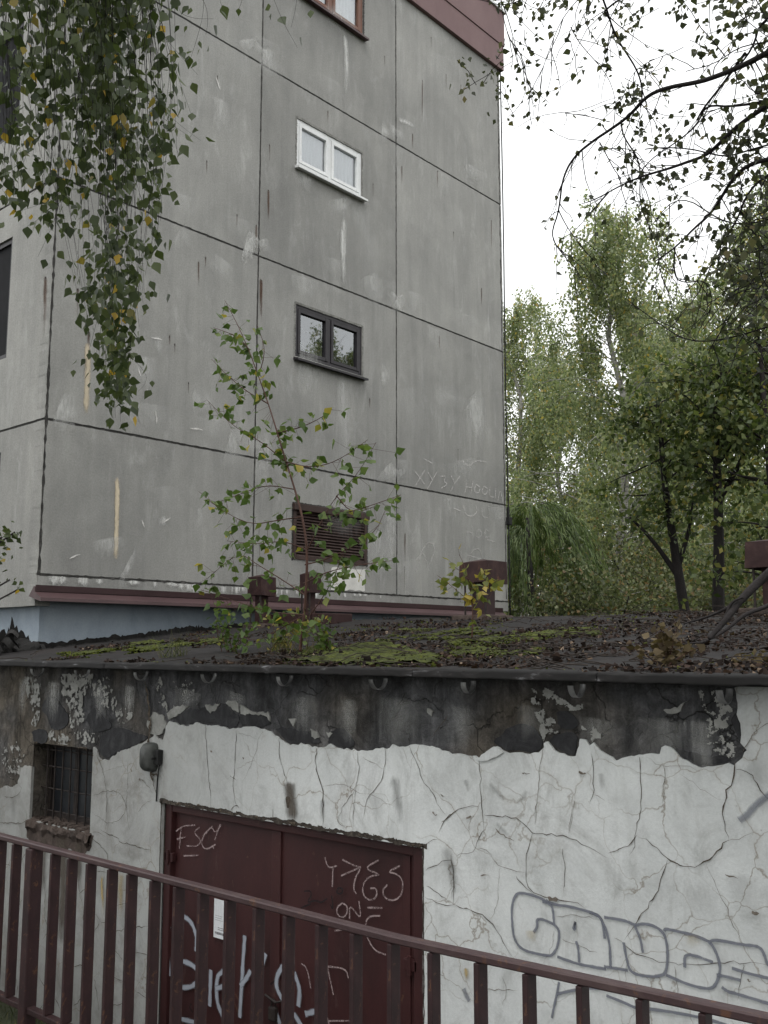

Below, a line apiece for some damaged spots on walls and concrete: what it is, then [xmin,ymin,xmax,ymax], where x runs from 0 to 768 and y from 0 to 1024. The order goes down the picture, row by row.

crack [78,757,157,1005]
crack [205,725,287,808]
peeling [0,666,746,788]
crack [315,723,768,1001]